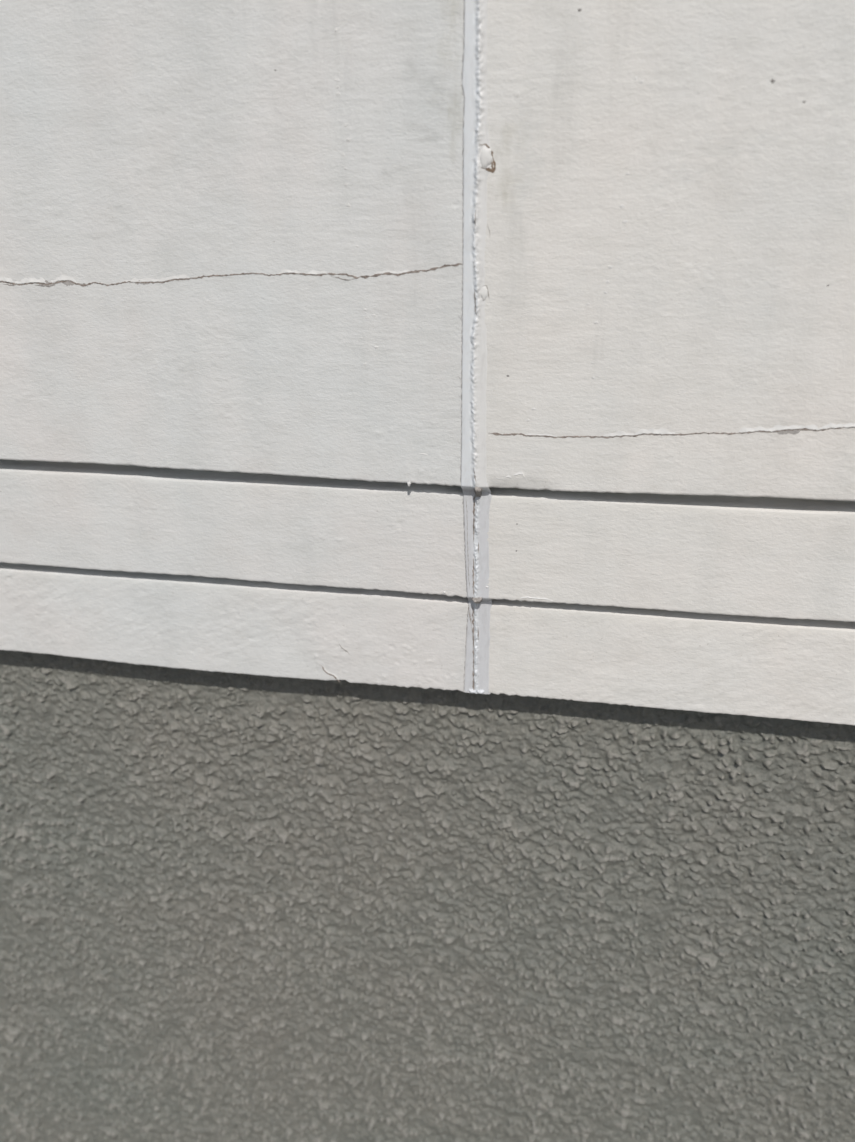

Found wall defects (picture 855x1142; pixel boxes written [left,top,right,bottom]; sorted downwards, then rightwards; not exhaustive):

crack [0,0,496,692]
crack [491,423,855,438]